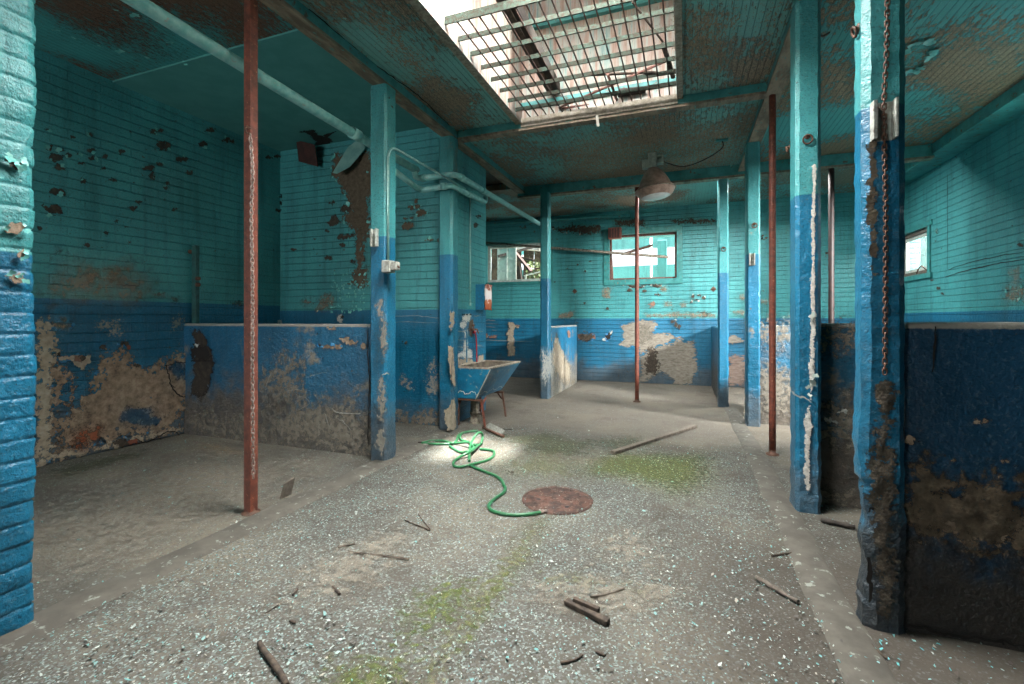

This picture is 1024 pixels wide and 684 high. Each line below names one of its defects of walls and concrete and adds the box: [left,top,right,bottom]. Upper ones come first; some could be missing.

peeling [904,38,939,76]
peeling [44,132,125,185]
peeling [142,127,193,190]
peeling [3,188,66,234]
peeling [4,248,30,284]
spalling [803,164,819,494]
spalling [2,311,970,684]
spalling [859,378,1024,620]